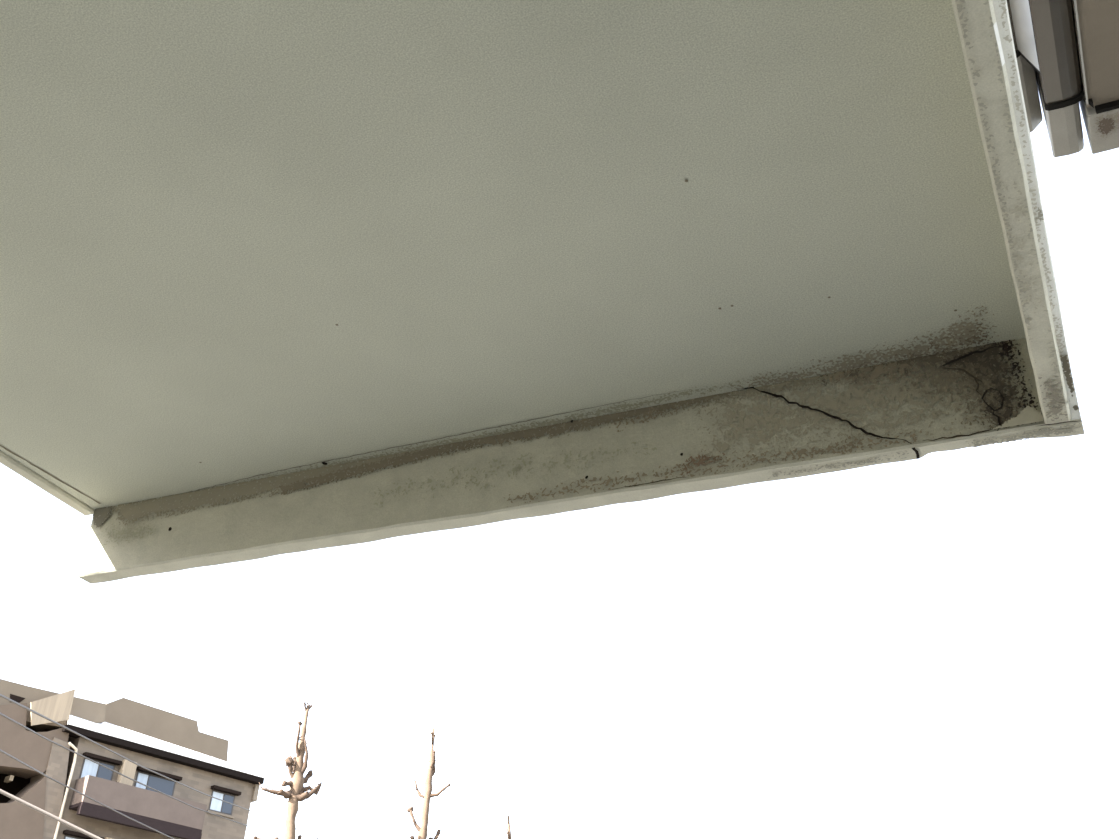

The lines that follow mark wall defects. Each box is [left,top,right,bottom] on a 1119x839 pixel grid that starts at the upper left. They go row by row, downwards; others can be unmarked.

damp [112,305,1081,526]
crack [741,346,1005,459]